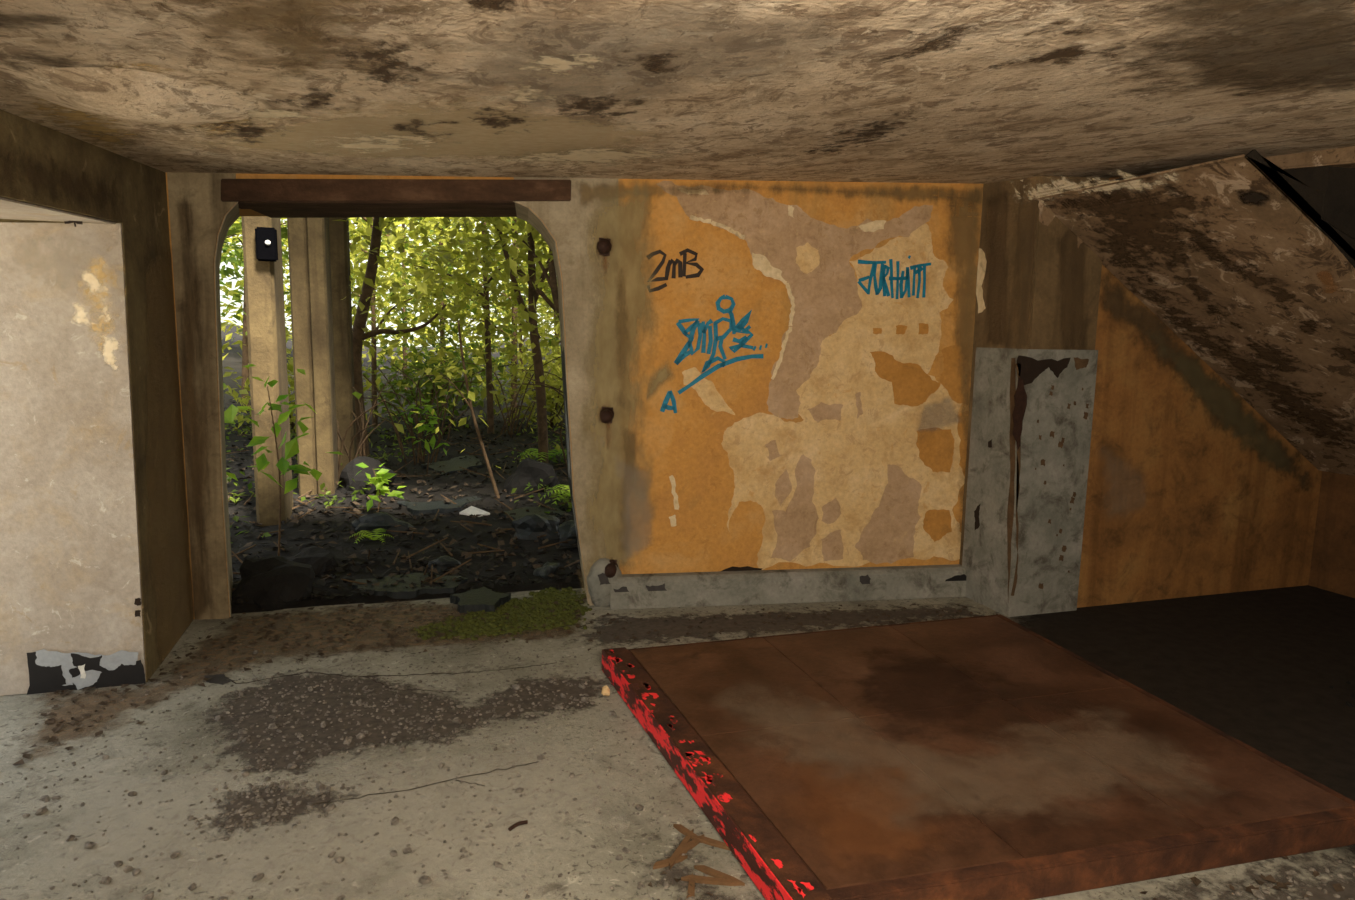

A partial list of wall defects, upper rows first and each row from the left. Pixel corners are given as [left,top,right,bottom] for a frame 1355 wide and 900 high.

damp [0,14,59,28]
damp [26,56,78,68]
damp [205,0,360,77]
damp [1126,0,1355,96]
peeling [976,248,987,313]
damp [1061,230,1086,350]
peeling [656,181,980,584]
damp [1101,275,1308,490]
peeling [27,649,146,695]